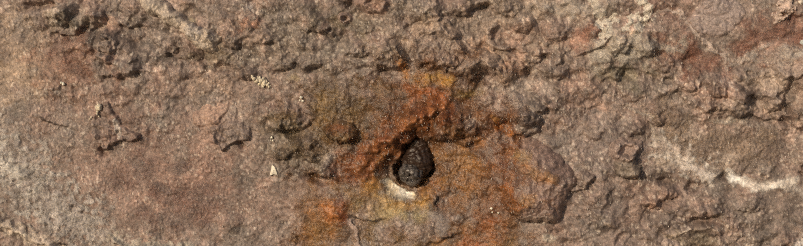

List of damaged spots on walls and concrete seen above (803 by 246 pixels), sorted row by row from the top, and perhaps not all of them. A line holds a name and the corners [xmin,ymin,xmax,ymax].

corrosion [294,199,343,239]
corrosion [311,61,518,246]